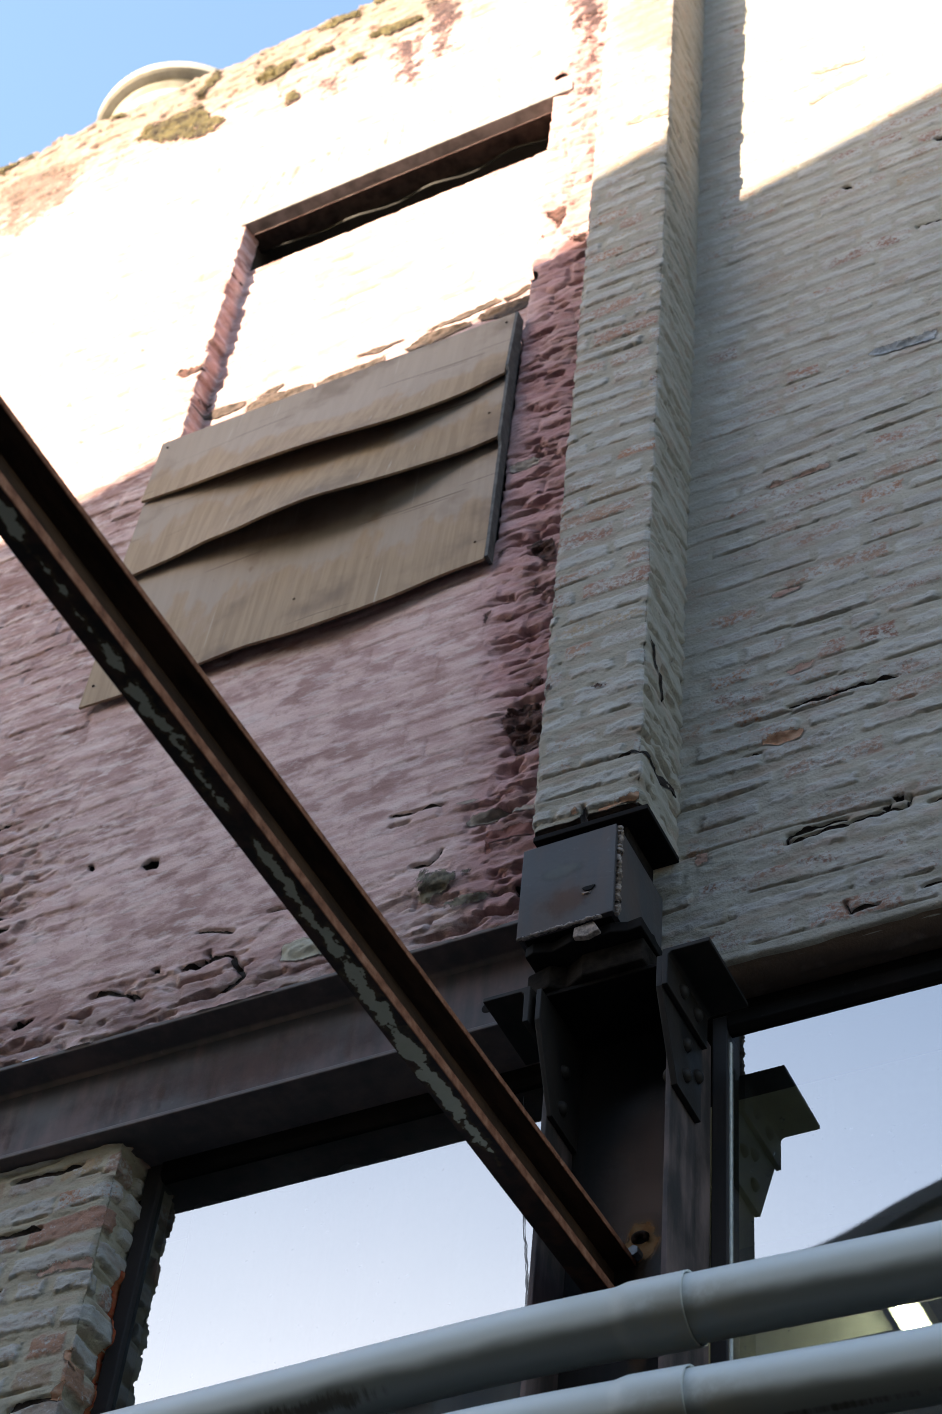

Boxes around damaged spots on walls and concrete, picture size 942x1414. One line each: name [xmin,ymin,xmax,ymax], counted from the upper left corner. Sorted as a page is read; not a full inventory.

leakage [388,0,463,84]
leakage [566,0,607,104]
crack [92,991,142,1002]
crack [182,931,246,996]